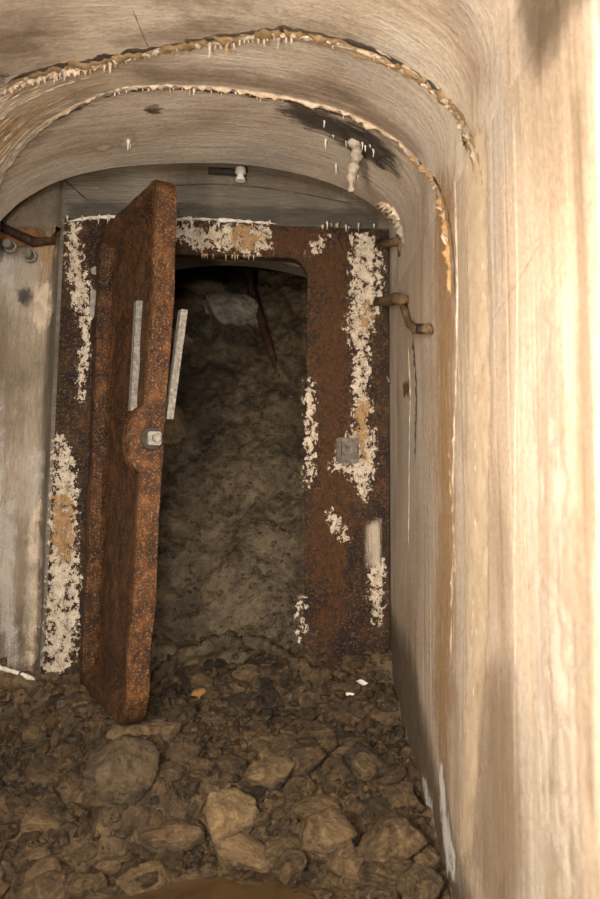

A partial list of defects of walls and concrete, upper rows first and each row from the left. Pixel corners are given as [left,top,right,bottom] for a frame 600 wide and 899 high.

damp [0,58,163,190]
damp [216,76,413,176]
corrosion [0,185,59,281]
damp [66,203,129,224]
damp [176,204,377,231]
damp [0,500,46,698]